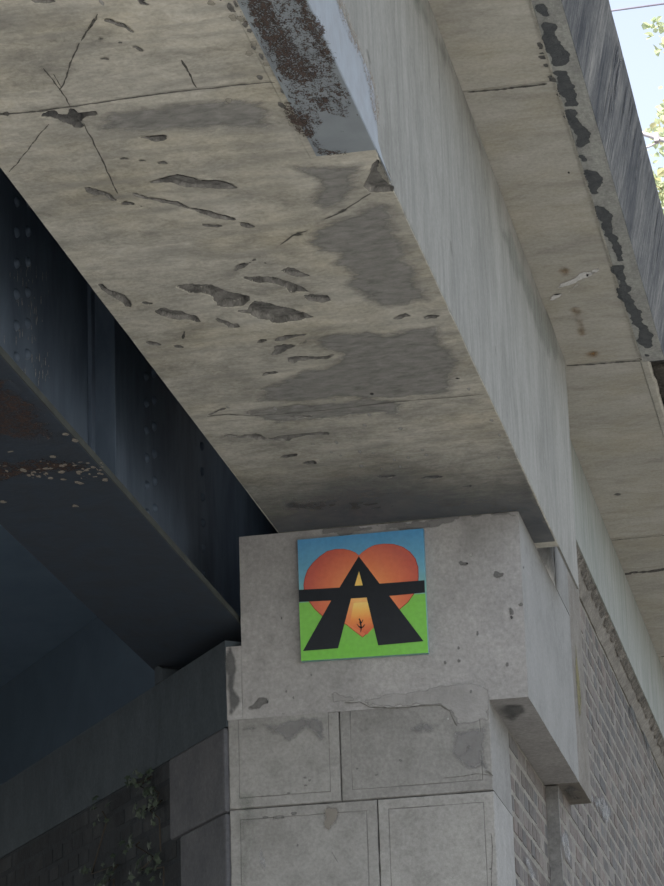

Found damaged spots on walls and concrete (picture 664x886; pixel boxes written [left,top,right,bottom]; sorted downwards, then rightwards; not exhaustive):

rust [240,0,358,156]
crack [0,14,275,194]
spalling [150,174,237,189]
spalling [364,160,394,192]
spalling [85,187,255,228]
spalling [234,259,330,303]
spalling [178,283,313,323]
spalling [257,334,334,363]
crack [625,567,664,575]
damp [226,648,239,714]
damp [269,718,322,739]
crack [345,702,457,726]